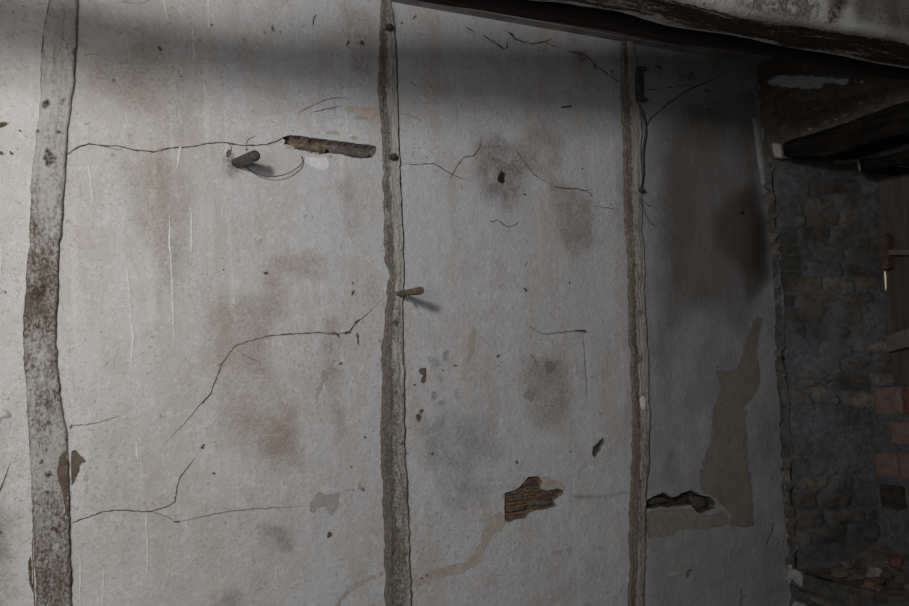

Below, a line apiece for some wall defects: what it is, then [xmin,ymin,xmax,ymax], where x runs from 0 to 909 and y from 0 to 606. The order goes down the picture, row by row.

crack [75,0,99,72]
crack [63,125,283,213]
crack [514,147,612,209]
crack [179,307,374,429]
crack [71,453,298,523]
spalling [414,476,565,586]
flaking render [646,490,728,538]